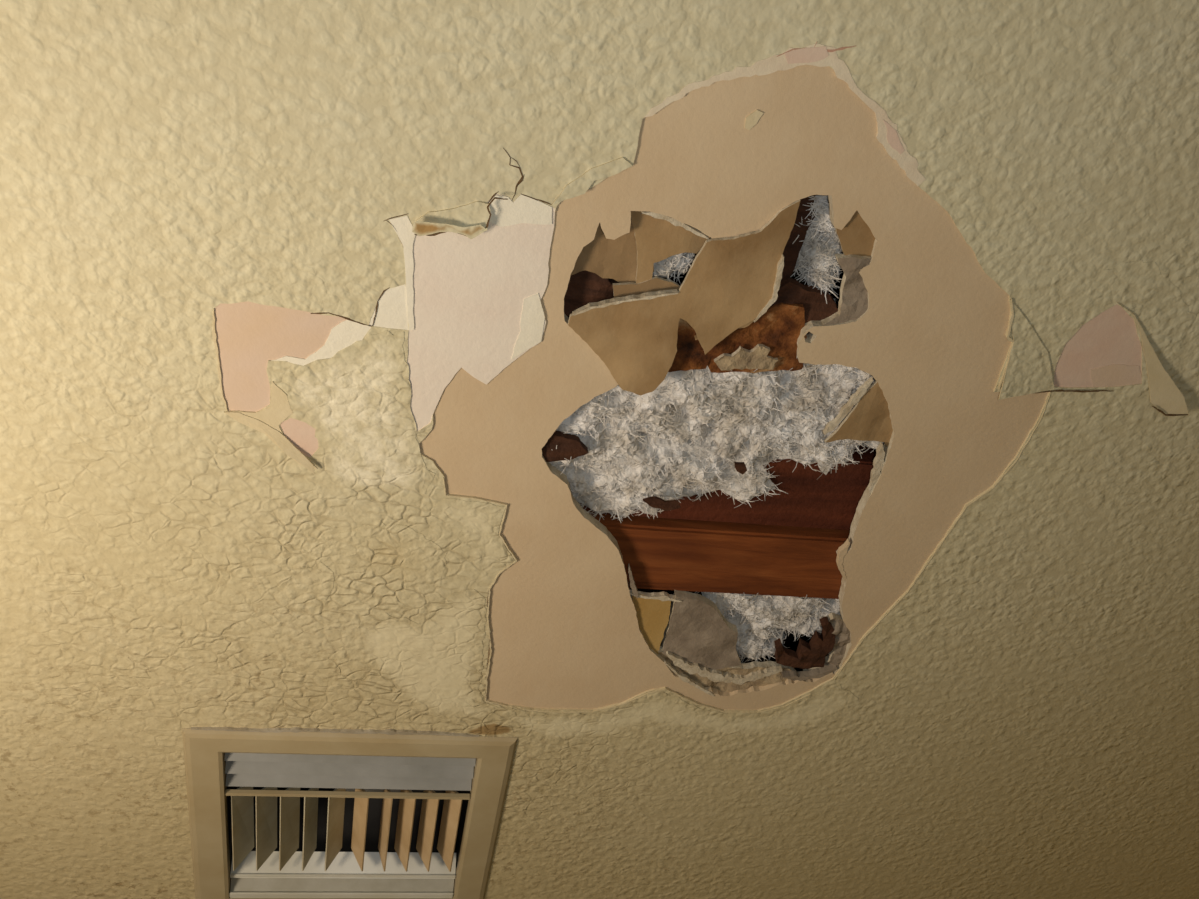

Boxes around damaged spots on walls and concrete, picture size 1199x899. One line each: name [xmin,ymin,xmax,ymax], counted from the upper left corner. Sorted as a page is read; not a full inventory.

peeling [212,44,1188,741]